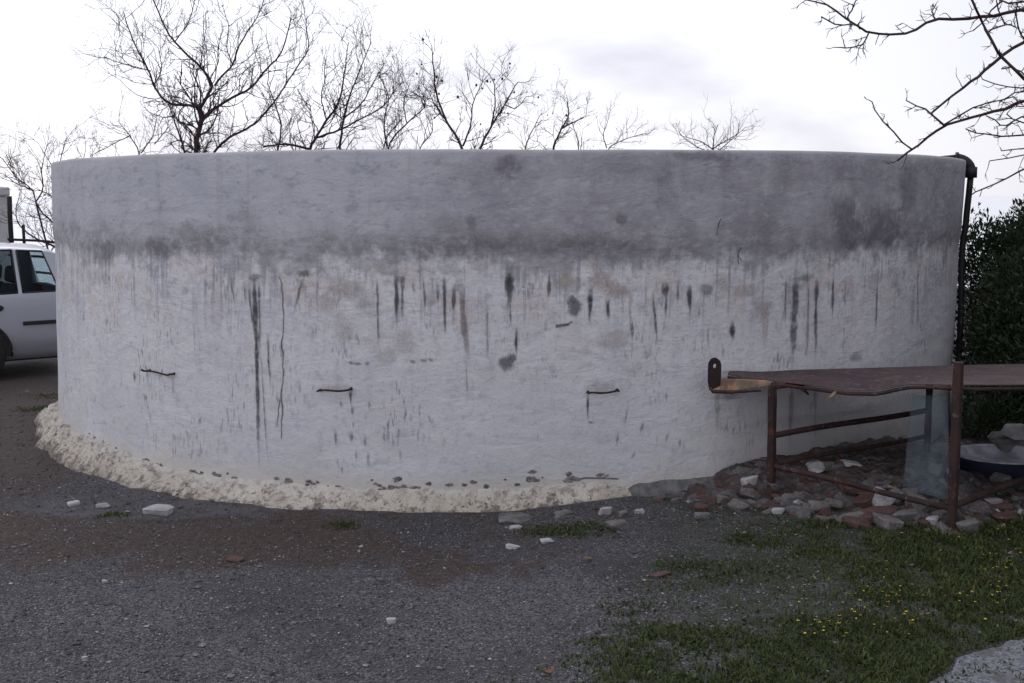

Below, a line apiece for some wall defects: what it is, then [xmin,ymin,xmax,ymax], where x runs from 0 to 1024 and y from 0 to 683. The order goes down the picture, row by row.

leakage [394,282,404,312]
leakage [443,283,455,325]
leakage [505,275,514,320]
leakage [785,288,798,339]
leakage [249,288,270,430]